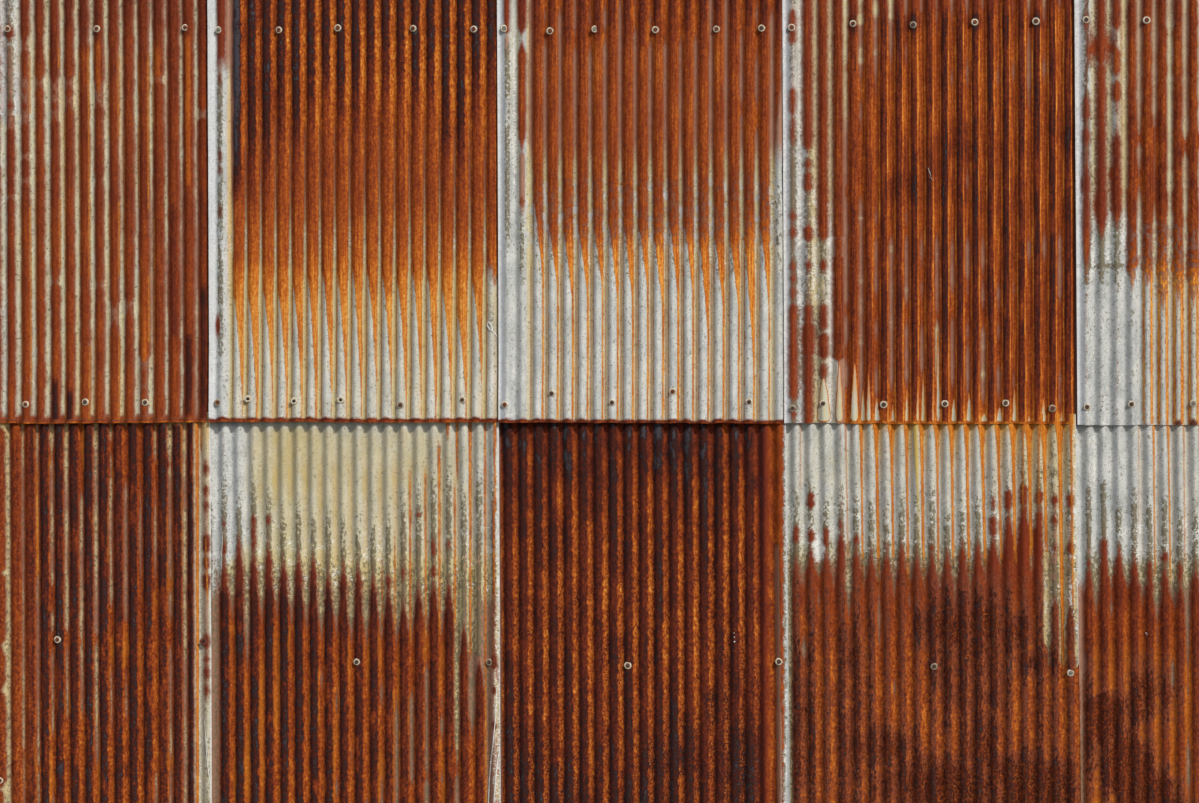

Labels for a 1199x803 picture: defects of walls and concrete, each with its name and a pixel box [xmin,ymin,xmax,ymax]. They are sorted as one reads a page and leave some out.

rust [0,0,785,803]
rust [788,0,1199,803]